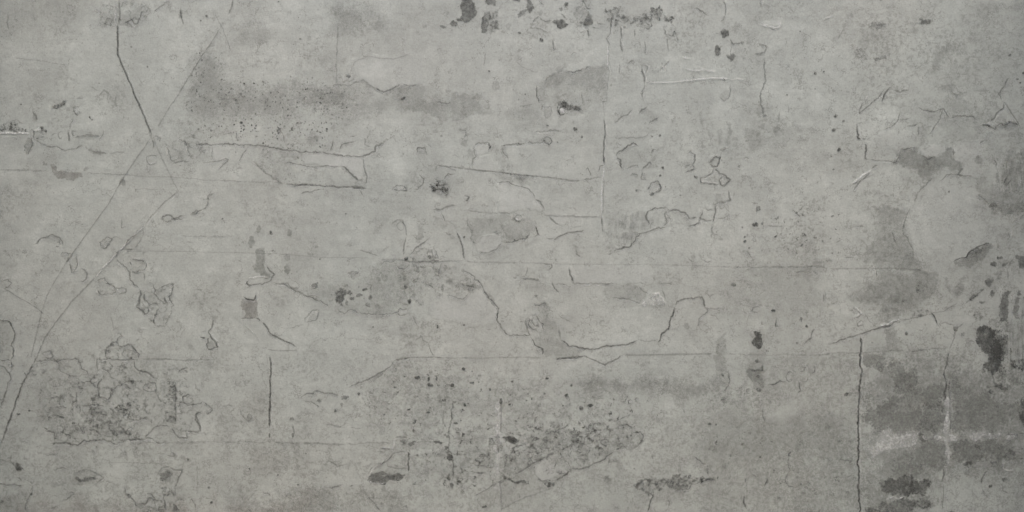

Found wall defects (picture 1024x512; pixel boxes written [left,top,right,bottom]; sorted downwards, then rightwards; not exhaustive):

crack [117,28,151,131]
crack [857,319,899,512]